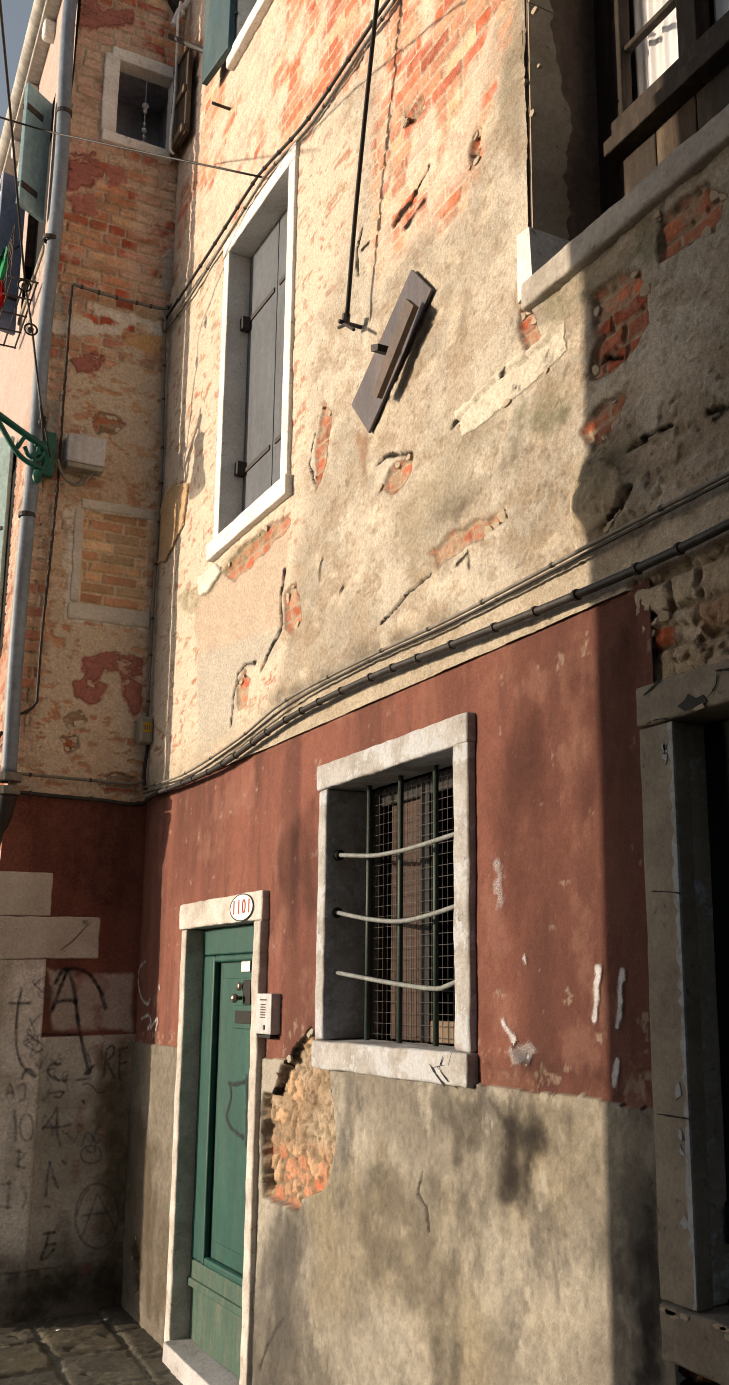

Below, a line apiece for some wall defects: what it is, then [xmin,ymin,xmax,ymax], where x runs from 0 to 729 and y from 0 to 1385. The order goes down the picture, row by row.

flaking render [401,95,426,129]
flaking render [468,128,482,170]
flaking render [520,0,572,240]
flaking render [589,270,651,380]
flaking render [314,402,332,490]
crack [377,452,413,466]
flaking render [581,393,625,446]
crack [230,557,343,726]
flaking render [265,1028,336,1210]
water stain [500,1117,544,1202]
crack [417,1180,430,1232]
water stain [632,1238,660,1385]